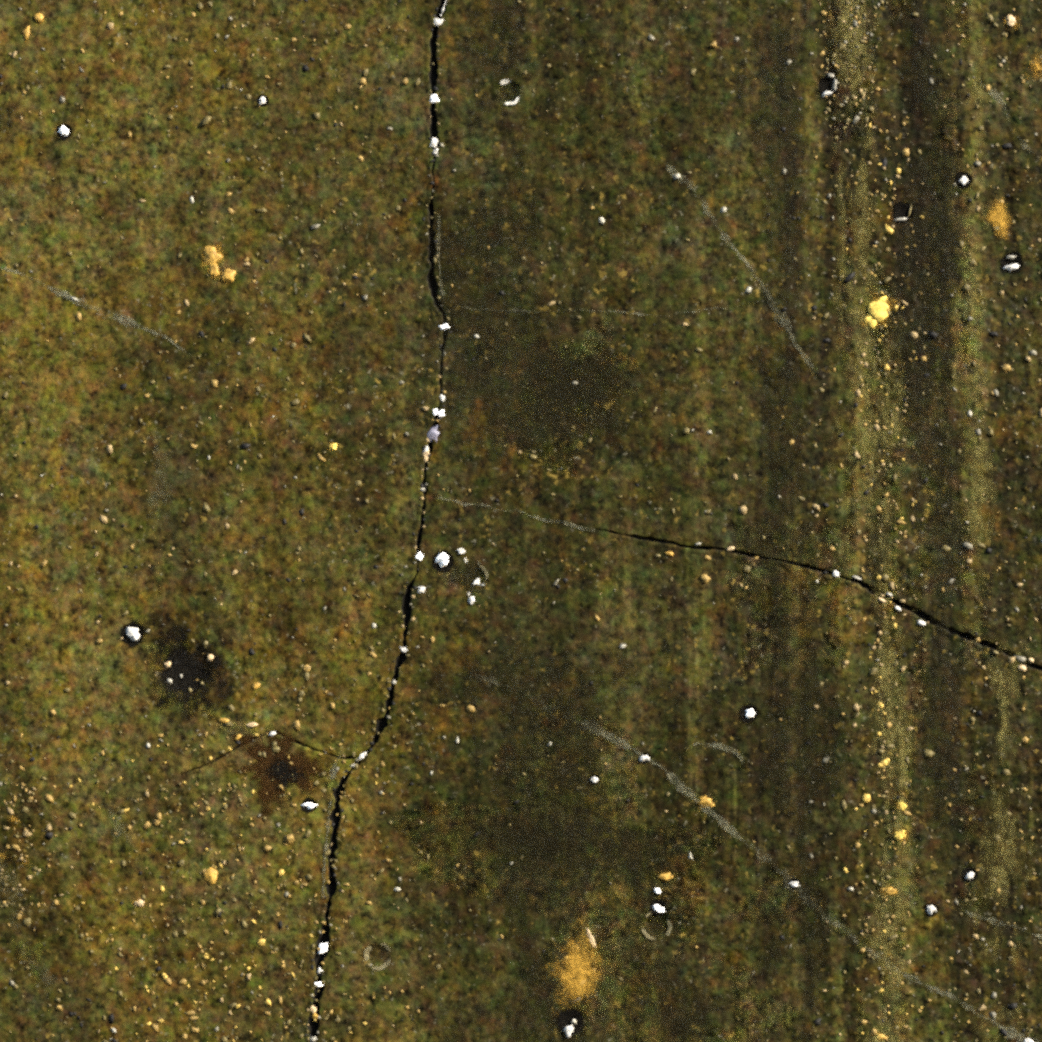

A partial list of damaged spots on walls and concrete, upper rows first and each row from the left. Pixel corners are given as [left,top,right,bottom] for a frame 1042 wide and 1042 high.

crack [722,234,750,268]
crack [764,289,813,366]
crack [181,0,526,1042]
crack [520,511,1042,675]
damp [150,615,235,723]
damp [233,722,332,813]
crack [582,723,741,839]
crack [826,918,968,1010]
crack [992,1020,1038,1042]